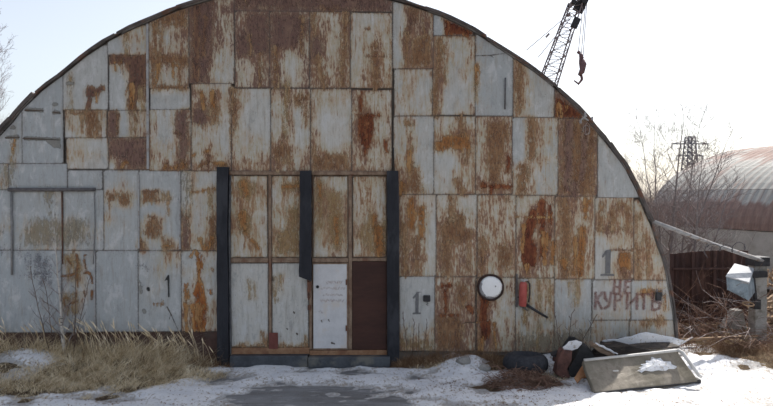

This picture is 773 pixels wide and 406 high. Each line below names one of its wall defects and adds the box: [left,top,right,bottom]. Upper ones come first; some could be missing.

corrosion [65,3,237,173]
corrosion [272,82,308,192]
corrosion [309,0,350,90]
corrosion [356,91,380,156]
corrosion [435,114,471,166]
corrosion [480,64,537,204]
corrosion [555,98,582,119]
corrosion [105,192,130,205]
corrosion [140,189,217,333]
corrosion [435,177,497,351]
corrosion [498,197,640,324]
corrosion [611,233,652,279]